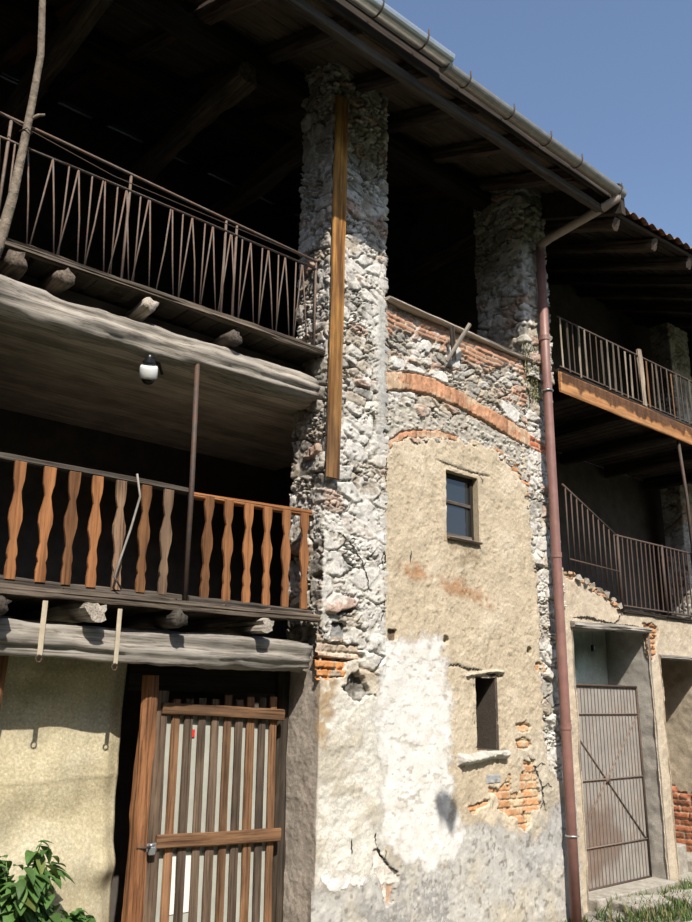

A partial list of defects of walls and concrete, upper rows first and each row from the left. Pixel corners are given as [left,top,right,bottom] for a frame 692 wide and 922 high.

peeling [312,631,540,903]
crack [372,833,398,872]
flaking render [672,784,692,853]